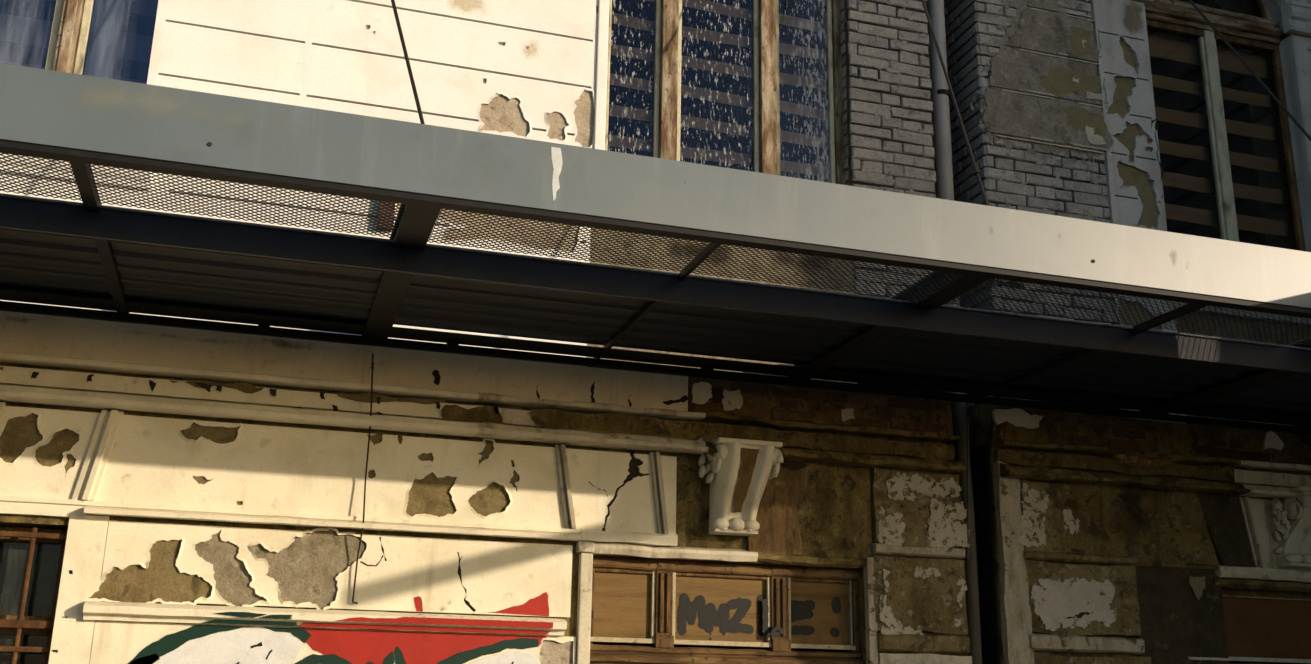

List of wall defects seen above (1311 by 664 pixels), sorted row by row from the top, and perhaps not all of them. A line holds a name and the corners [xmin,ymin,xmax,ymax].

flaking render [1063,0,1167,231]
flaking render [0,410,83,473]
flaking render [177,419,243,447]
flaking render [149,380,277,396]
flaking render [320,370,503,467]
flaking render [403,453,520,520]
crack [590,450,649,531]
peeling [878,506,906,546]
peeling [926,498,970,548]
flaking render [89,527,369,610]
crack [457,552,476,615]